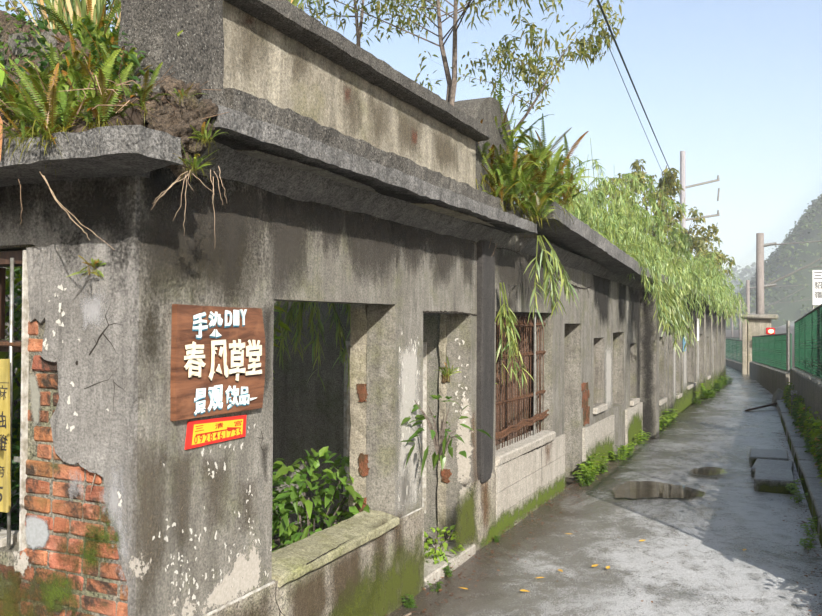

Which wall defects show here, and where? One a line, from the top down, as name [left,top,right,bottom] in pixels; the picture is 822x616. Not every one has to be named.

peeling [0,30,58,97]
leakage [213,135,440,207]
leakage [0,176,131,262]
leakage [139,168,474,303]
leakage [473,218,524,233]
crack [84,304,124,406]
leakage [143,308,160,362]
spalling [13,284,152,616]
peeling [152,478,269,616]
leakage [292,549,360,616]
leakage [376,534,385,578]
leakage [394,519,402,556]